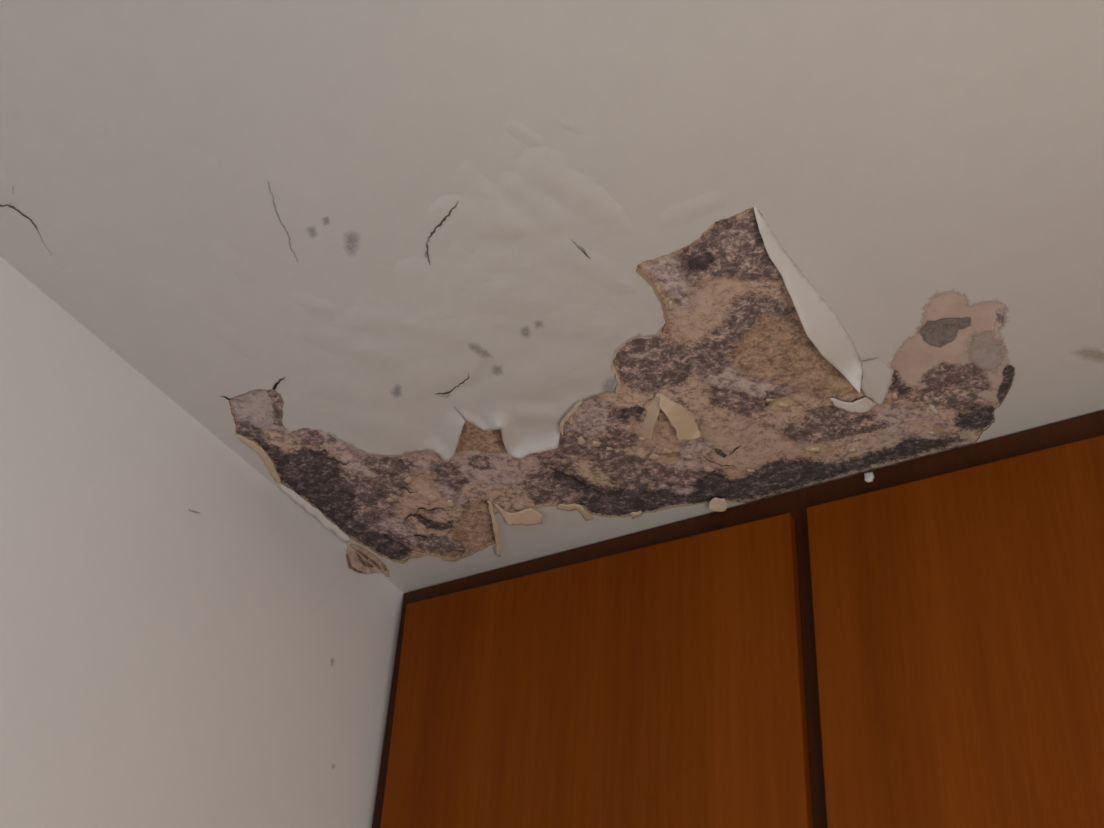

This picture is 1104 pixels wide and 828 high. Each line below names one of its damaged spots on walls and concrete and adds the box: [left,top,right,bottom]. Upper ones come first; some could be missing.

crack [0,186,52,255]
crack [268,182,298,262]
crack [425,201,459,265]
peeling [229,206,1015,577]